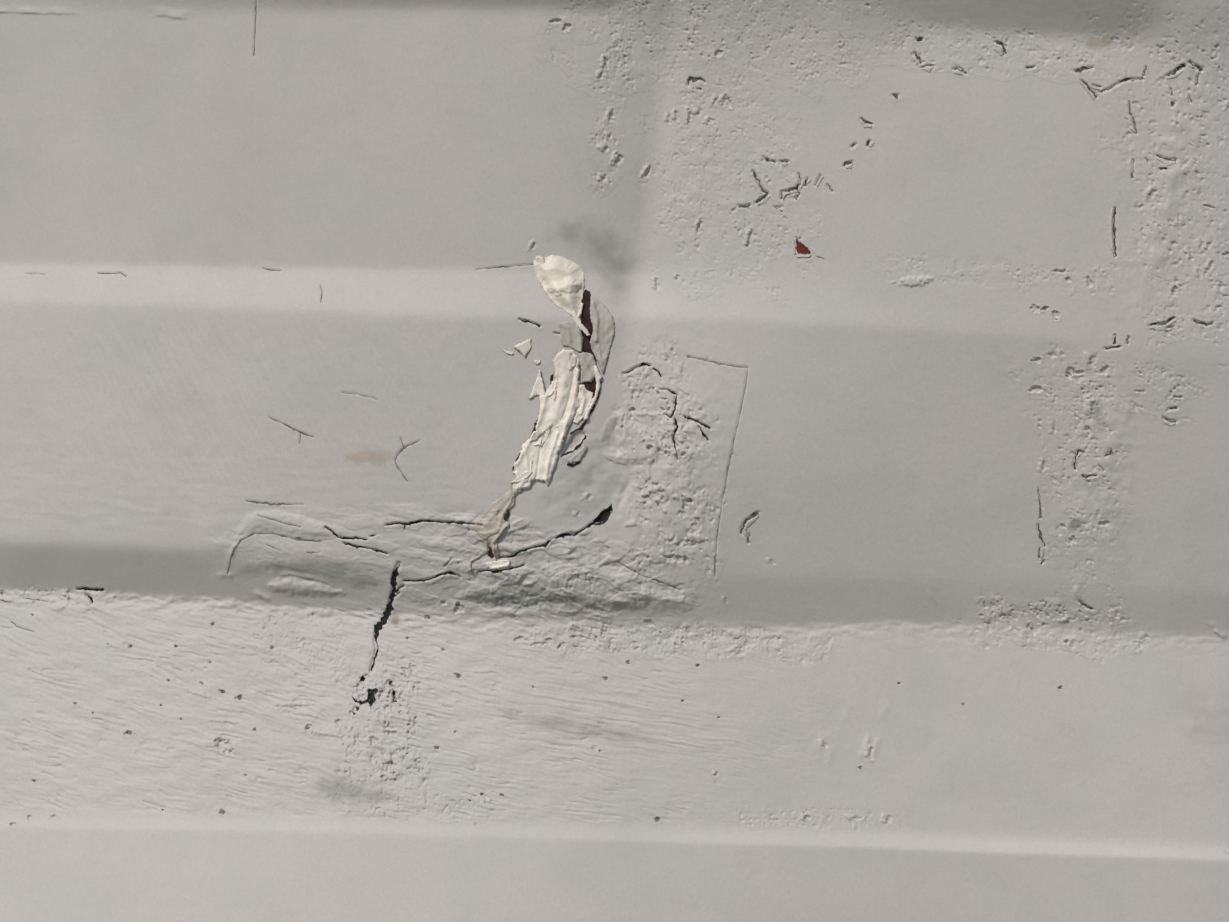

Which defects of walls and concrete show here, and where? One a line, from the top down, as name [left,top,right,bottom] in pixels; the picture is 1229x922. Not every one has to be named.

peeling [502,338,545,399]
spalling [523,0,1229,665]
crack [227,501,593,671]
peeling [486,560,510,569]